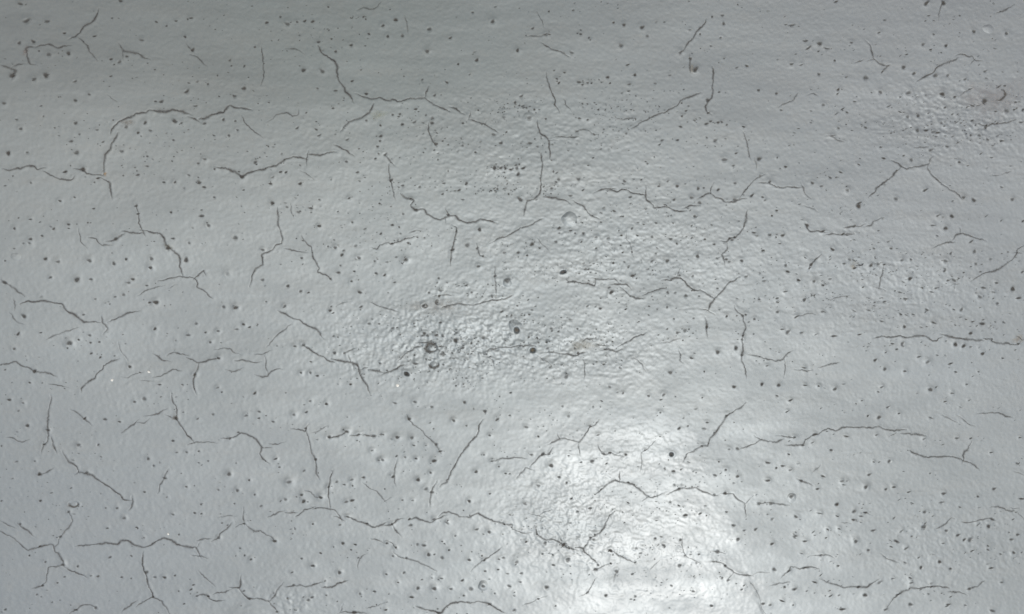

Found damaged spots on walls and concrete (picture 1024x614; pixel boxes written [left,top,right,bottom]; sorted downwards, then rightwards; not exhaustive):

crack [320,50,487,134]
crack [18,107,248,192]
crack [412,127,750,326]